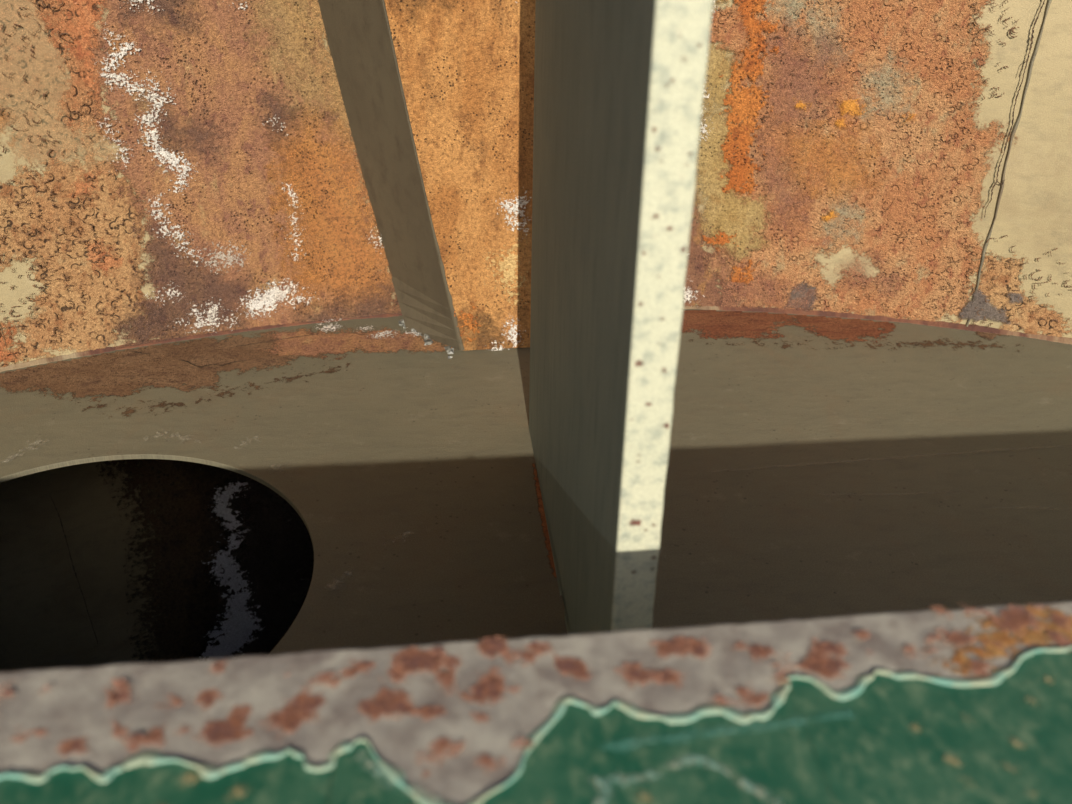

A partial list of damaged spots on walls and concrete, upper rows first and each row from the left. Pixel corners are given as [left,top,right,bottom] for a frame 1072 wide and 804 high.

water stain [96,22,251,274]
corrosion [0,0,536,417]
water stain [282,182,306,261]
corrosion [681,0,1072,352]
crack [984,0,1045,218]
water stain [173,278,319,333]
peeling [959,289,1023,324]
corrosion [179,661,375,746]
corrosion [359,636,591,721]
corrosion [615,636,710,688]
corrosion [733,639,850,684]
corrosion [57,737,88,756]